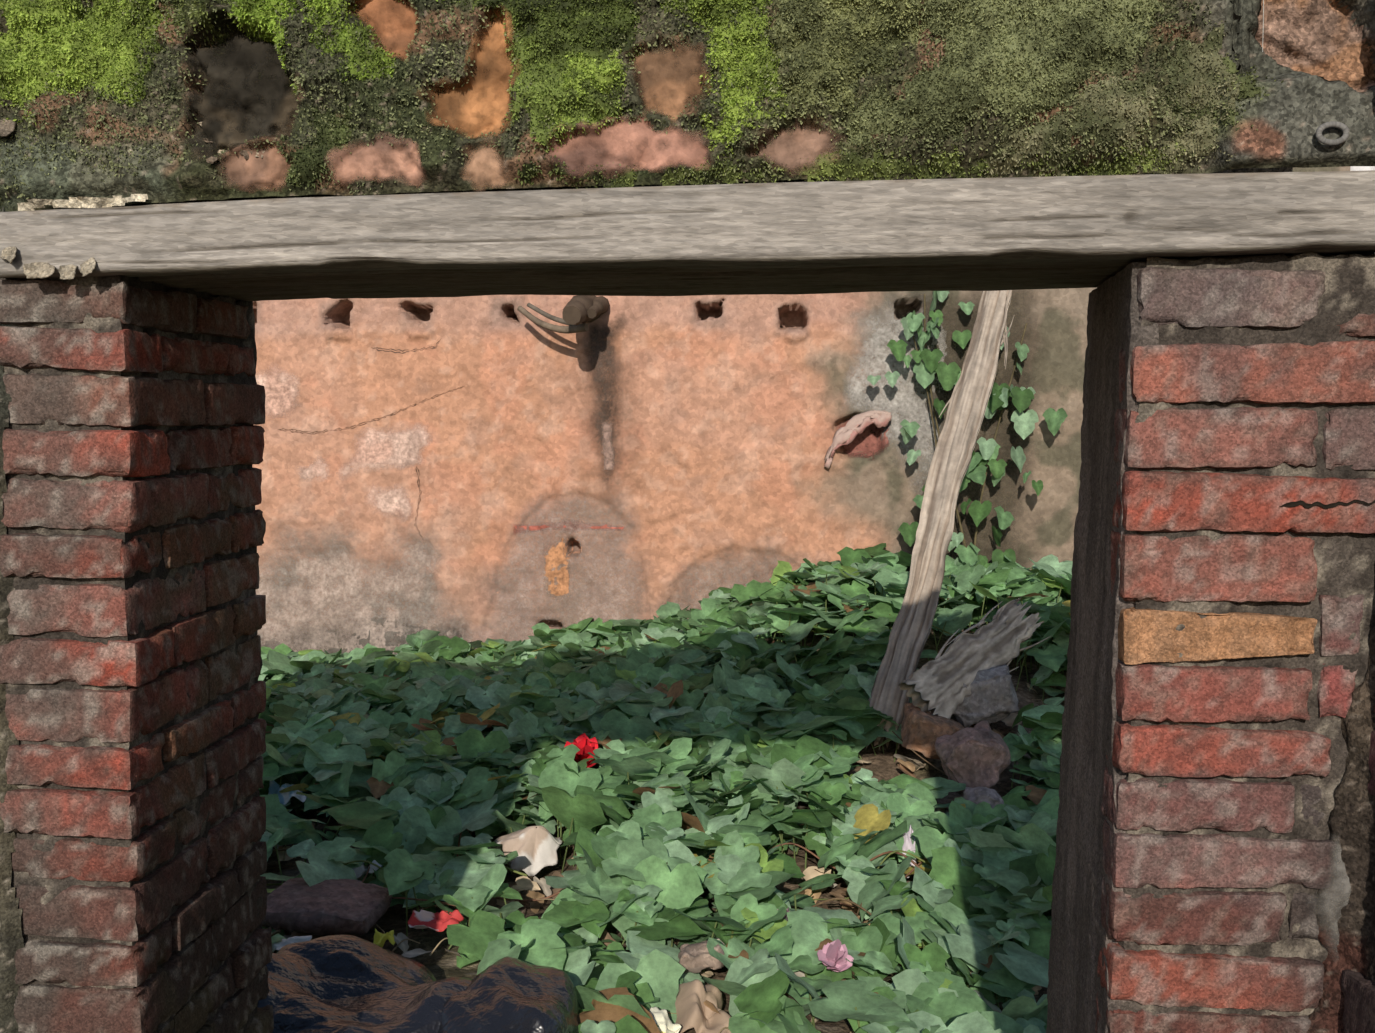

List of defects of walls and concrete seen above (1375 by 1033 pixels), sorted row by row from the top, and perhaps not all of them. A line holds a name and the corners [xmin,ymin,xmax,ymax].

crack [1227,1,1242,94]
spalling [1255,0,1375,92]
leakage [588,320,622,474]
crack [1279,500,1375,509]